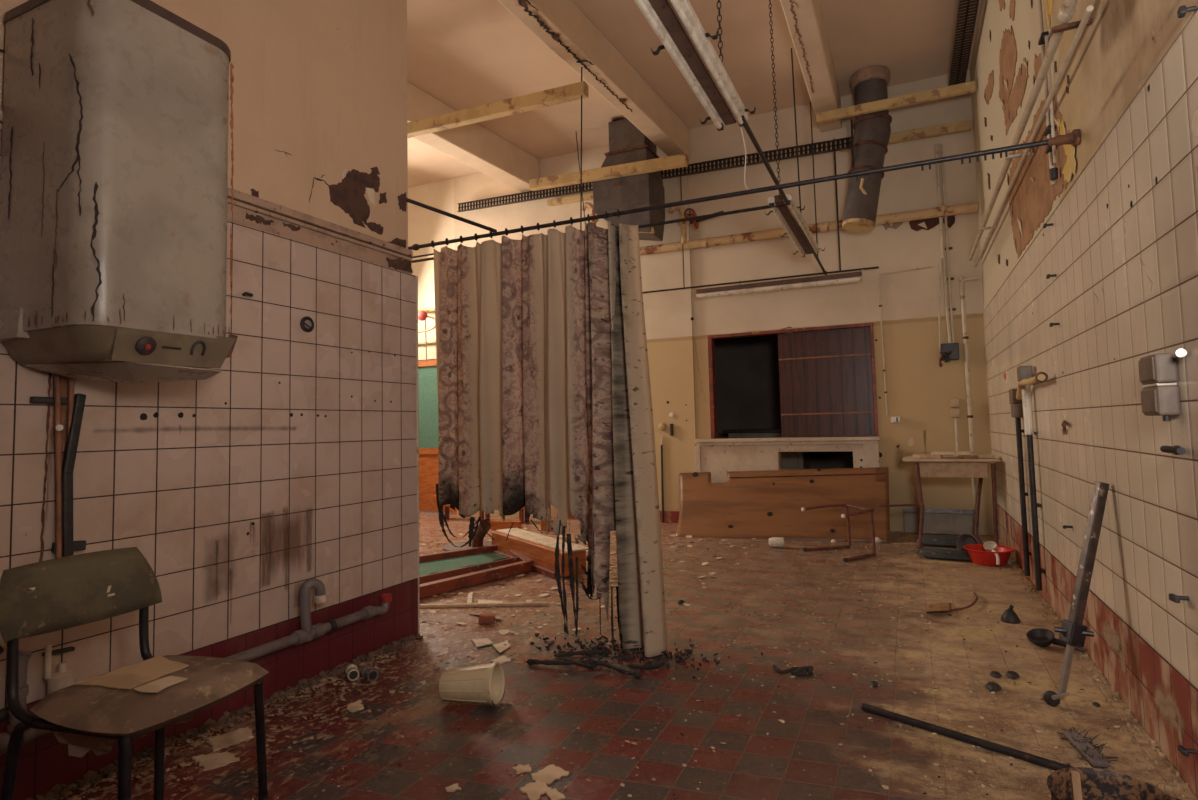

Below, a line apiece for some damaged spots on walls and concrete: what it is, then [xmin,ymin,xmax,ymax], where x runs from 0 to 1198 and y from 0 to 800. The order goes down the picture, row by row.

peeling [984,0,1076,266]
flaking render [329,167,413,273]
peeling [1154,687,1183,744]